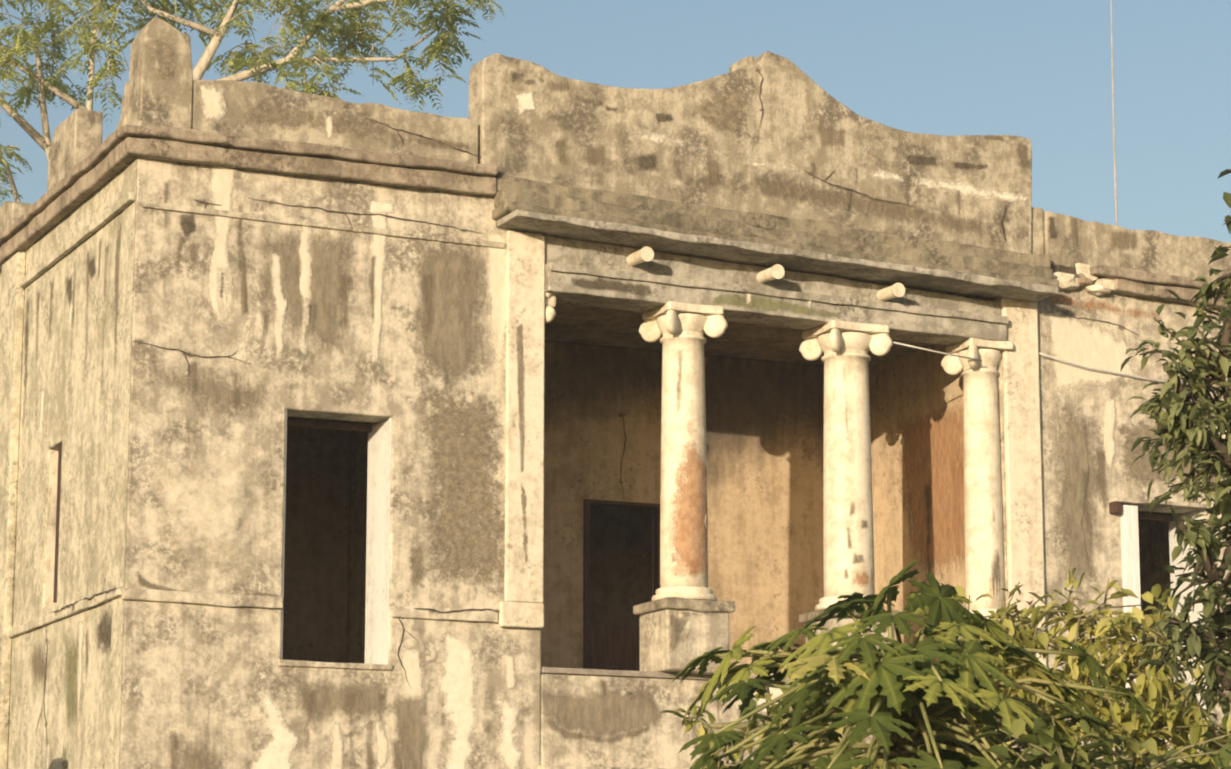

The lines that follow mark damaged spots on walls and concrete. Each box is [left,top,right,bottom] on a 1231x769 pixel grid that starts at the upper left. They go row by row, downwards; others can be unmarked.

crack [366,118,482,158]
crack [755,67,763,130]
crack [804,170,915,208]
leakage [165,166,349,412]
leakage [370,201,394,363]
crack [135,341,250,375]
leakage [410,232,507,587]
crack [618,407,626,498]
leakage [1048,294,1215,579]
leakage [246,693,298,769]
leakage [301,649,427,769]
leakage [438,634,478,769]